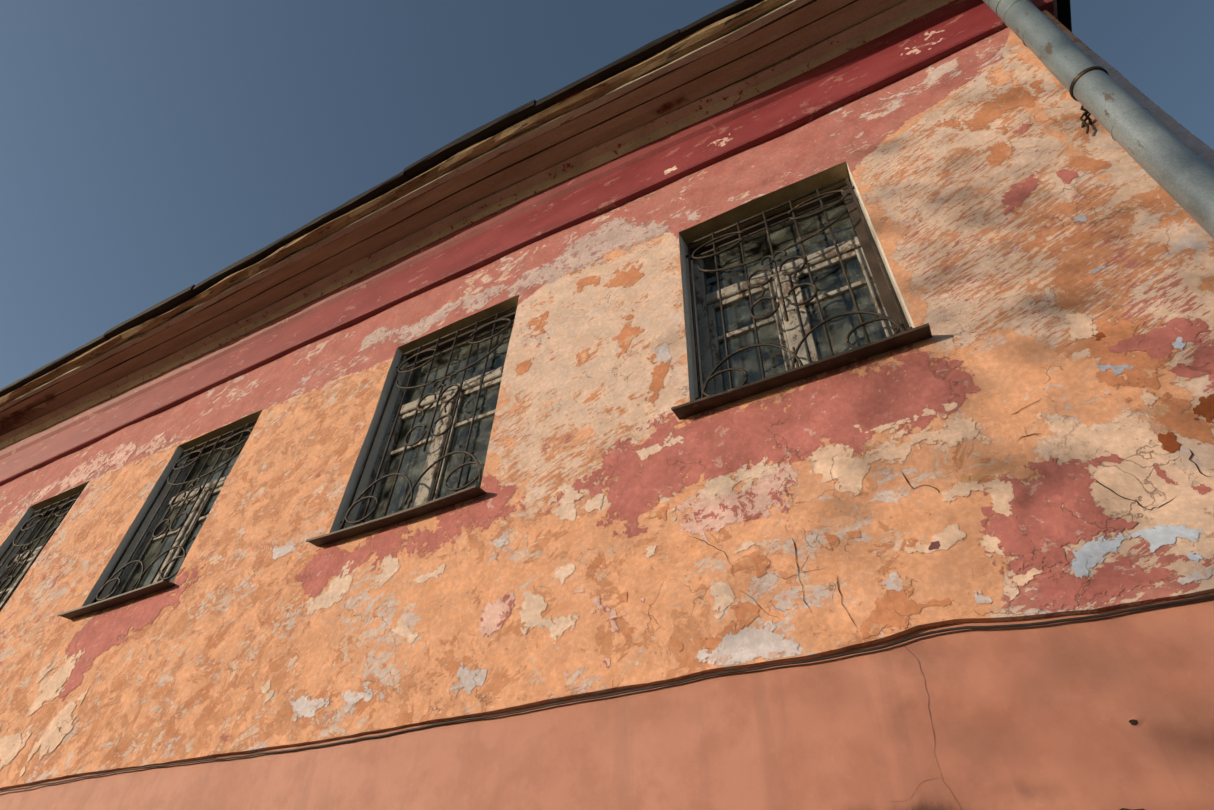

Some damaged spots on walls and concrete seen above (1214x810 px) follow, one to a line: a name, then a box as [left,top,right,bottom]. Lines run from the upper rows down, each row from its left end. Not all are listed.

peeling [901,30,945,59]
peeling [932,79,1046,166]
peeling [1001,171,1042,215]
peeling [545,343,991,558]
peeling [904,307,1214,610]
peeling [295,473,526,615]
peeling [478,563,644,644]
peeling [697,580,802,666]
peeling [860,572,953,639]
peeling [289,686,373,722]
peeling [447,662,487,696]
crack [888,645,962,810]